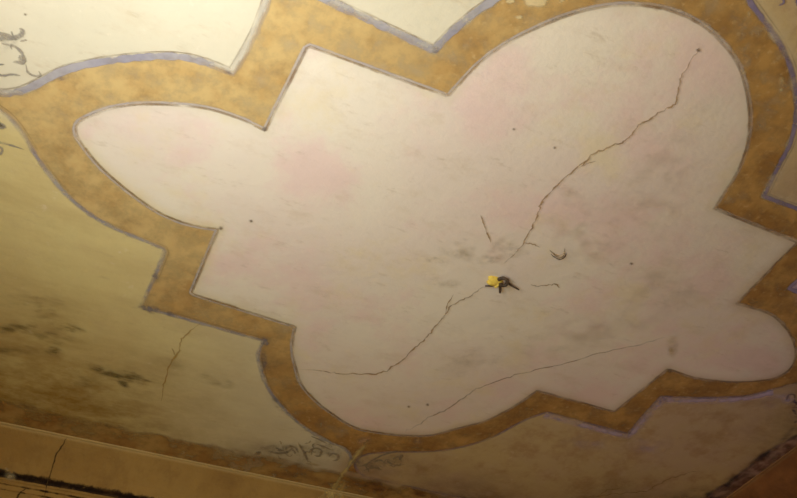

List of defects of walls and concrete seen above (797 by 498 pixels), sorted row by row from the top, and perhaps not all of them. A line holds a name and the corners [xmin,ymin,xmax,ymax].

crack [513,53,697,256]
crack [317,291,478,375]